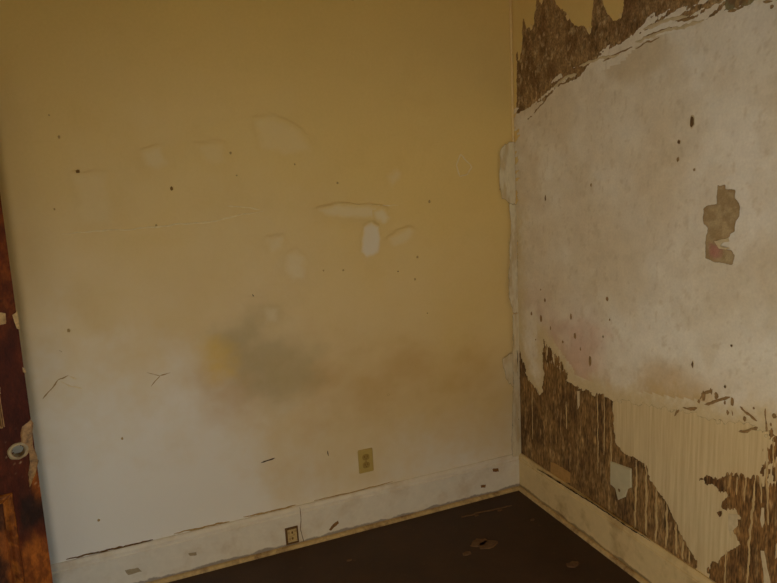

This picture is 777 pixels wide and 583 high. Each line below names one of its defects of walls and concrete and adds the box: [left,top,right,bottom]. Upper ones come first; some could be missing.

water stain [175,142,729,457]
flaking render [514,0,777,583]